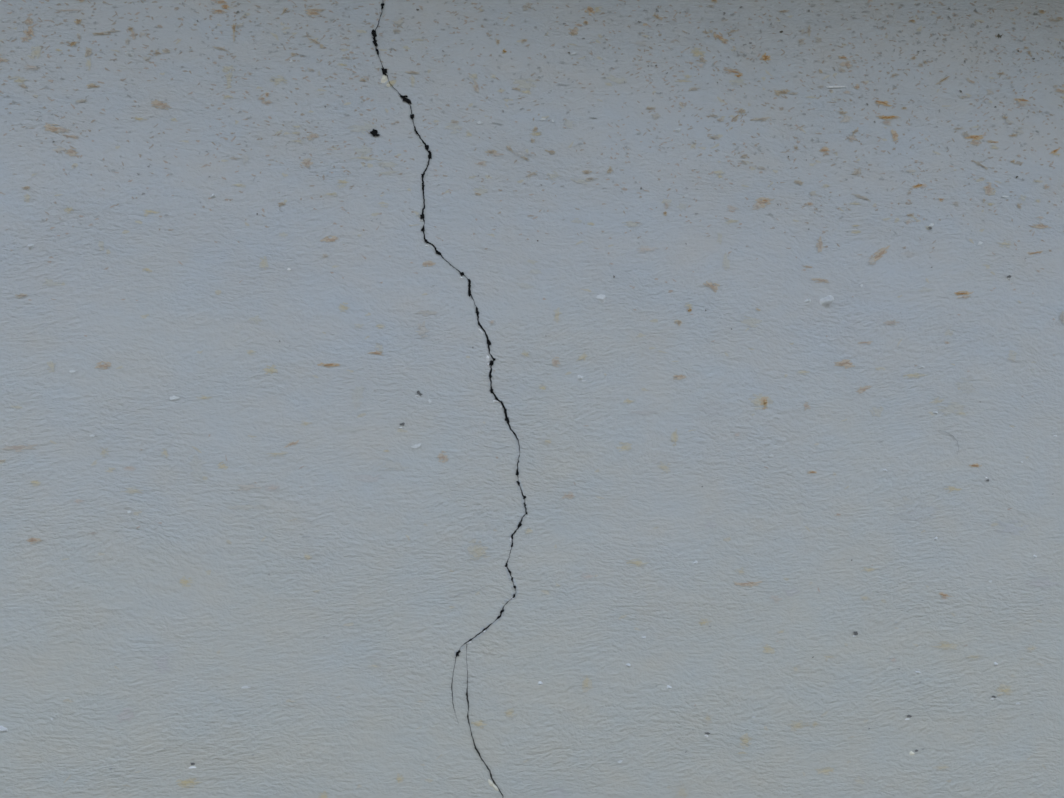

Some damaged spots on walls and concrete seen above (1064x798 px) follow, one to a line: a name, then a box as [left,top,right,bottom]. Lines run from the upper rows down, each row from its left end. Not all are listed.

crack [371,0,527,796]